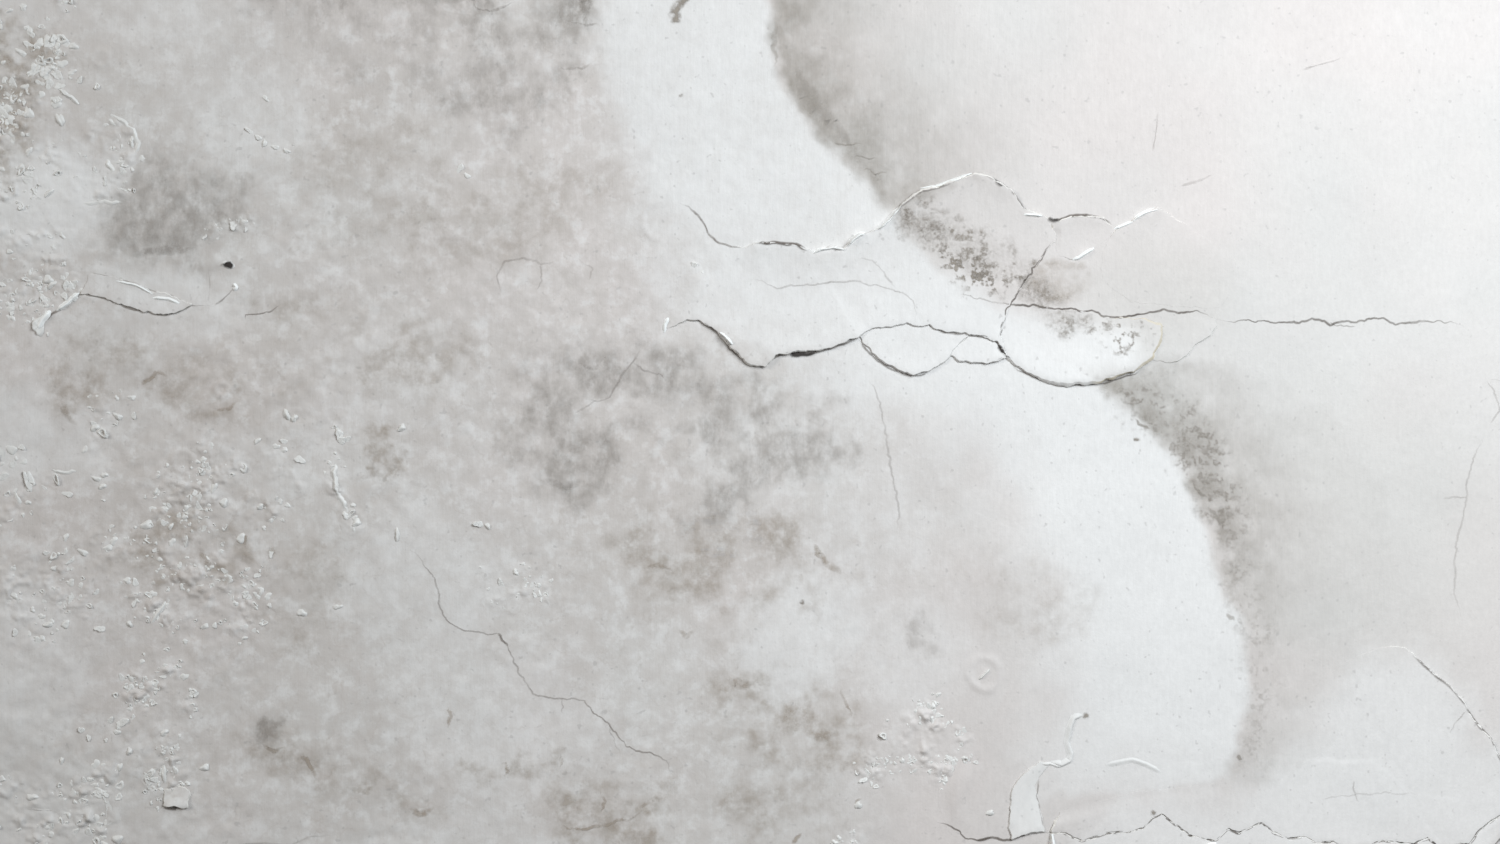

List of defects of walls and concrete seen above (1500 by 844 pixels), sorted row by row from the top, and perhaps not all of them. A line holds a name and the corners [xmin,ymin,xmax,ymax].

leakage [671,0,688,22]
flaking render [663,173,1237,387]
flaking render [951,646,1500,844]